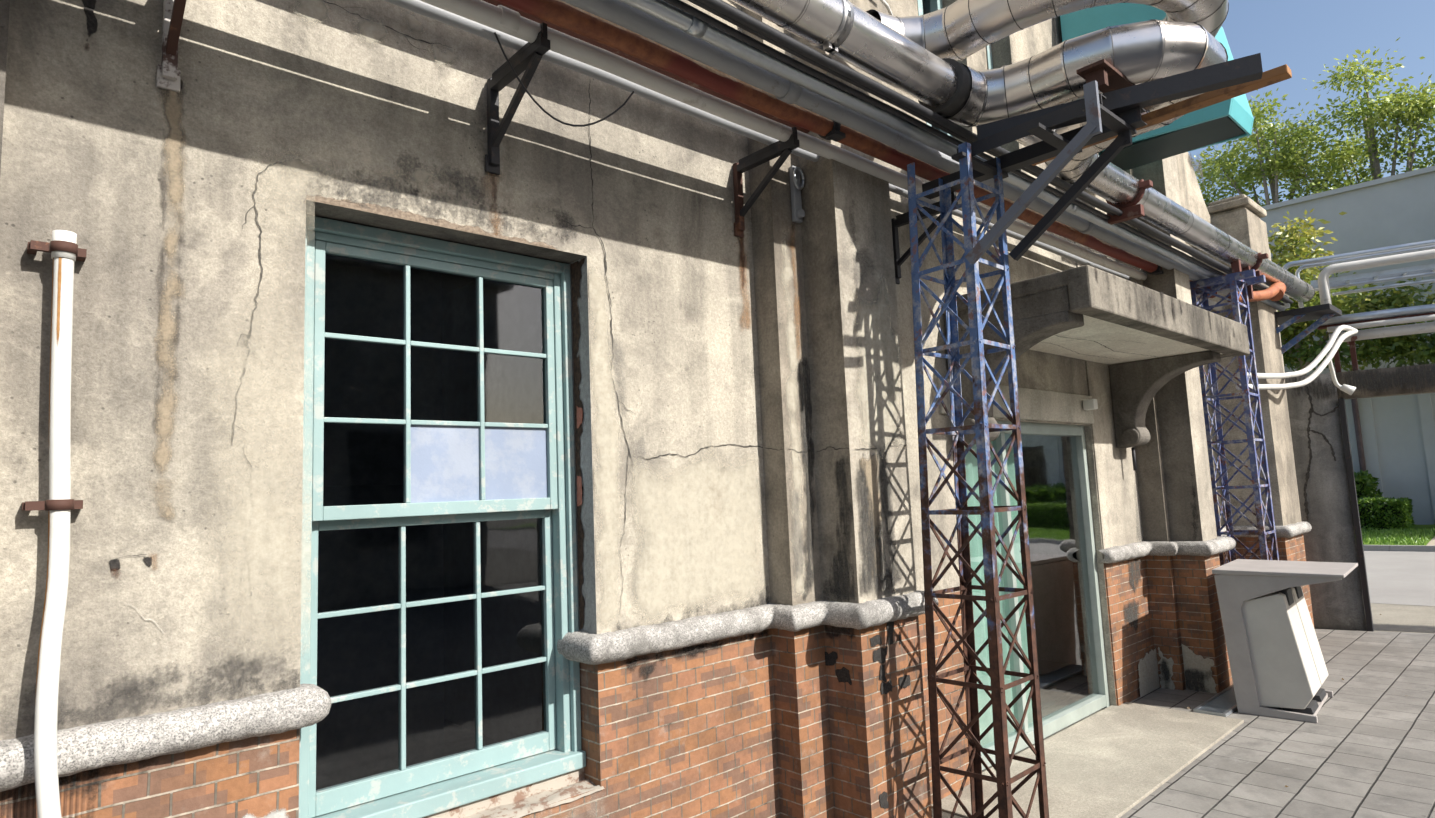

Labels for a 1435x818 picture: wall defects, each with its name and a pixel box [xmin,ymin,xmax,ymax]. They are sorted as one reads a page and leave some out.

crack [231,162,288,496]
water stain [320,157,507,226]
spalling [304,195,561,251]
spalling [571,258,585,629]
crack [567,84,906,609]
water stain [797,358,901,600]
flaking render [1138,643,1217,697]